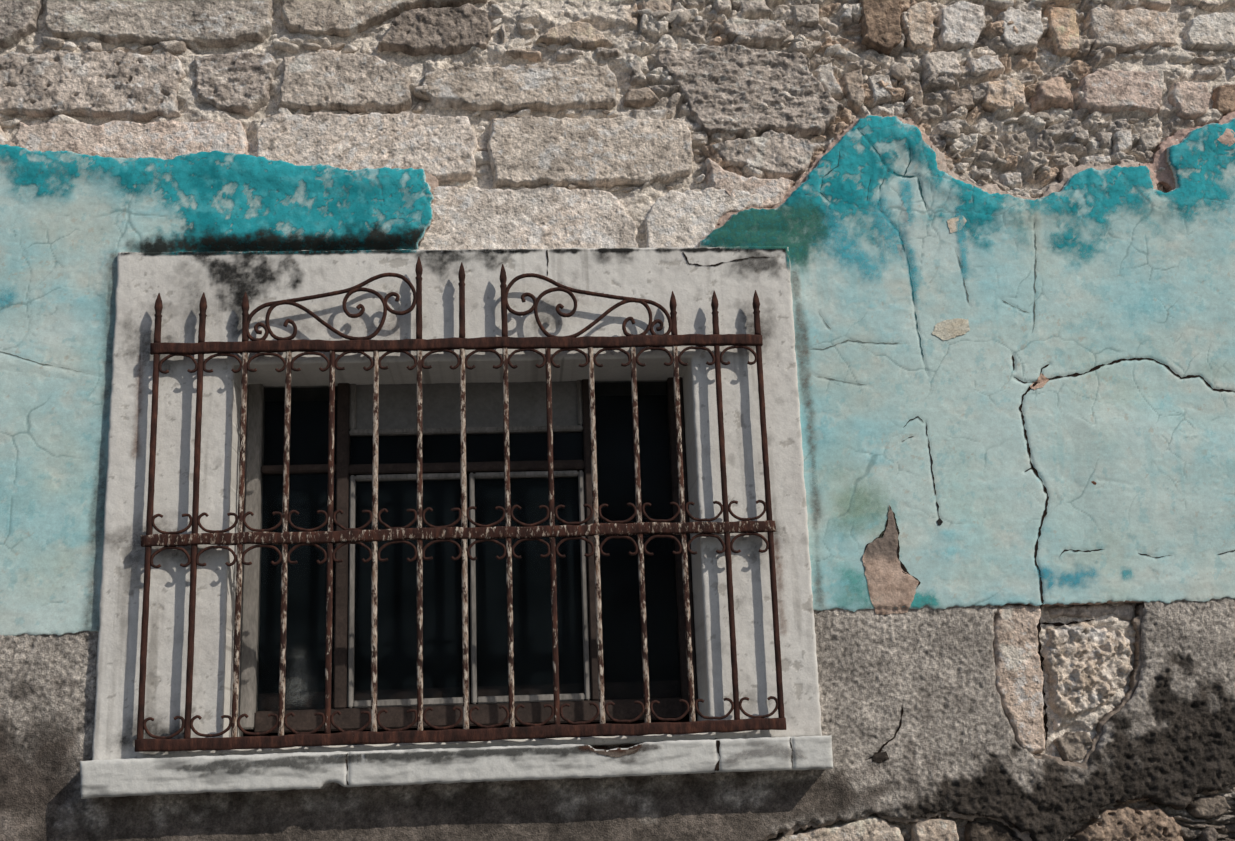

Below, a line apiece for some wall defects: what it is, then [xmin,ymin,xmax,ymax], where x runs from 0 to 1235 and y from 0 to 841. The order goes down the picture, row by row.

leakage [0,144,581,335]
peeling [374,166,439,222]
leakage [596,248,639,260]
crack [813,128,930,385]
leakage [655,115,1235,407]
crack [1002,215,1037,329]
spalling [932,318,970,340]
crack [903,416,940,518]
spalling [862,505,921,615]
crack [1012,355,1235,748]
crack [712,738,720,774]
crack [865,705,904,760]